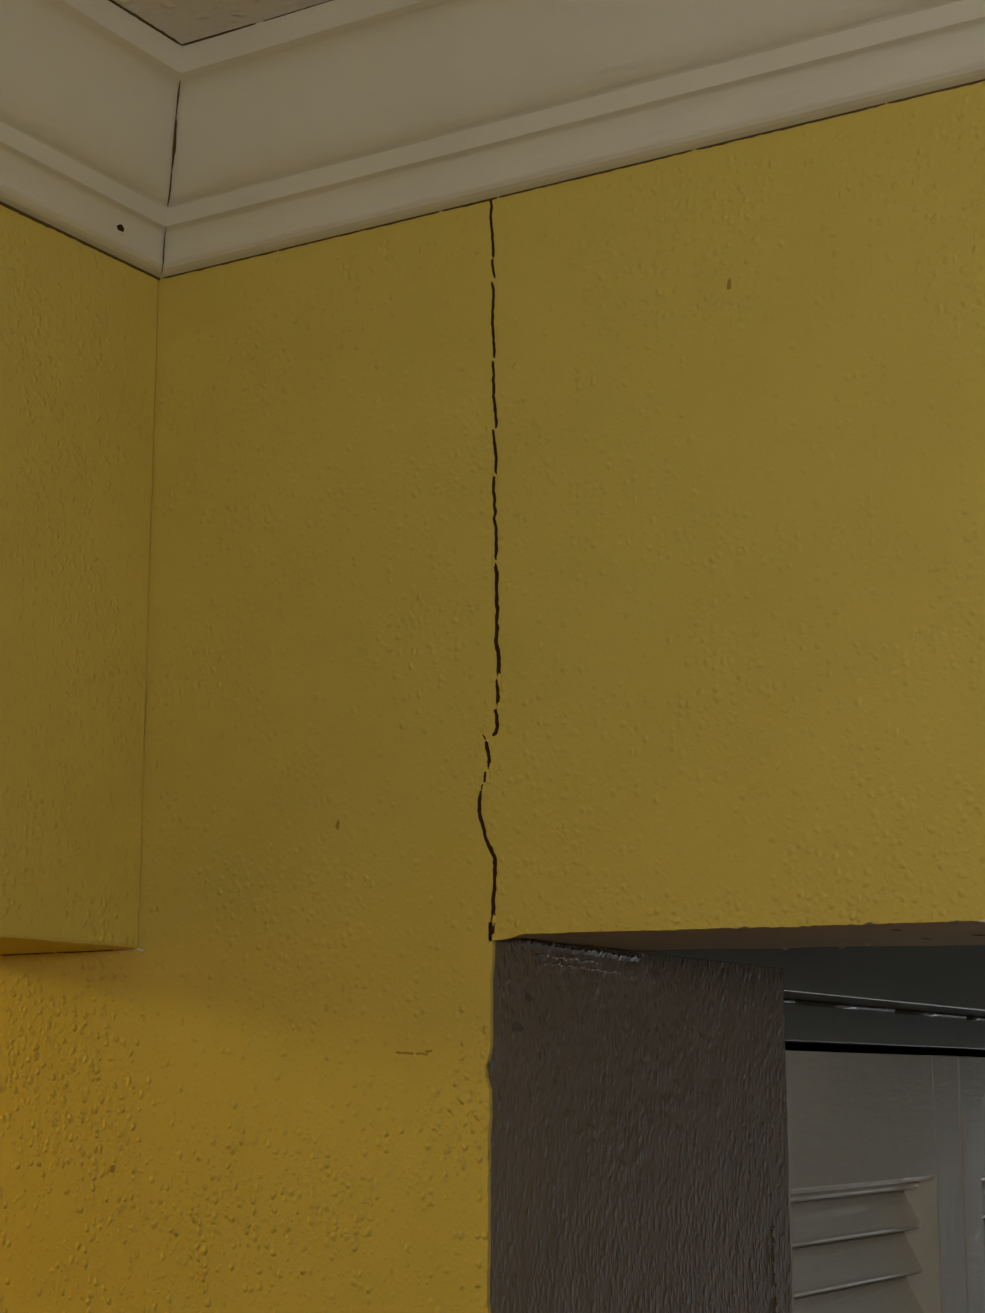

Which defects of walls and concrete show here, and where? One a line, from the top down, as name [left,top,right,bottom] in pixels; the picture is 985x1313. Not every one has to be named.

crack [161,80,181,274]
crack [477,200,501,936]